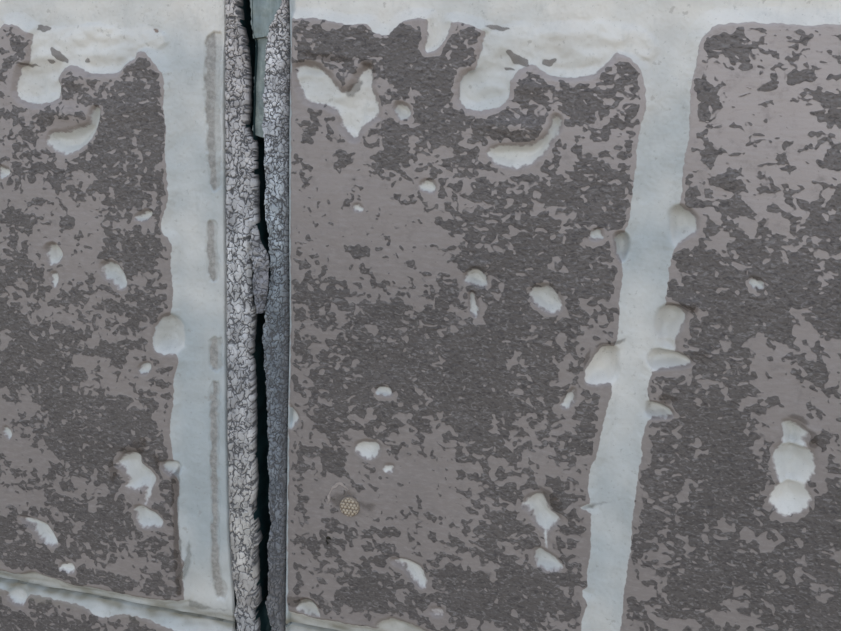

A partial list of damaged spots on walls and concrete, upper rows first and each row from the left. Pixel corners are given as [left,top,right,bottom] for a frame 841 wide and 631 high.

spalling [43,104,103,160]
spalling [11,22,169,108]
spalling [292,60,414,142]
spalling [419,17,454,56]
spalling [482,111,565,173]
spalling [454,16,660,115]
crack [225,0,290,631]
spalling [524,281,567,319]
spalling [556,343,622,412]
spalling [111,450,185,534]
spalling [517,490,567,575]
spalling [762,416,820,521]